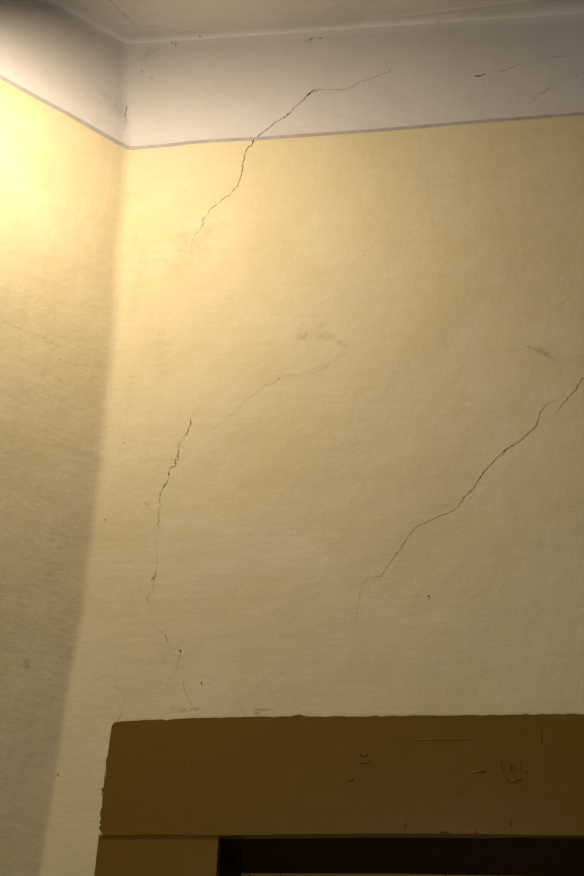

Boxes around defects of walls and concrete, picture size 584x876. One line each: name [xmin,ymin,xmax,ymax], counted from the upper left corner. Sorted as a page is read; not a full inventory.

crack [200,71,390,229]
crack [159,419,191,499]
crack [387,378,584,567]